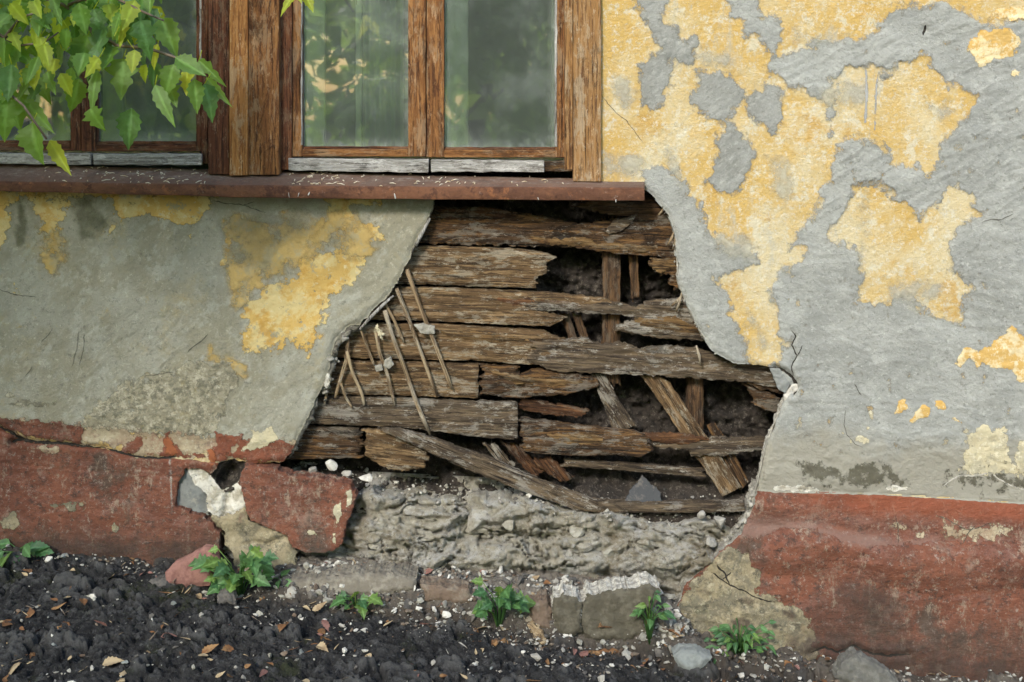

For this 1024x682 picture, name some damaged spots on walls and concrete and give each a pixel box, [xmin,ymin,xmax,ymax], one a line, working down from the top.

peeling [967,5,1024,77]
flaking render [411,202,435,255]
flaking render [606,214,637,234]
flaking render [653,195,729,366]
flaking render [0,191,394,571]
flaking render [414,323,435,334]
crack [775,331,802,394]
peeling [955,326,1024,383]
crack [0,426,177,459]
leakage [798,461,911,488]
spalling [678,367,820,661]
crack [711,565,775,603]